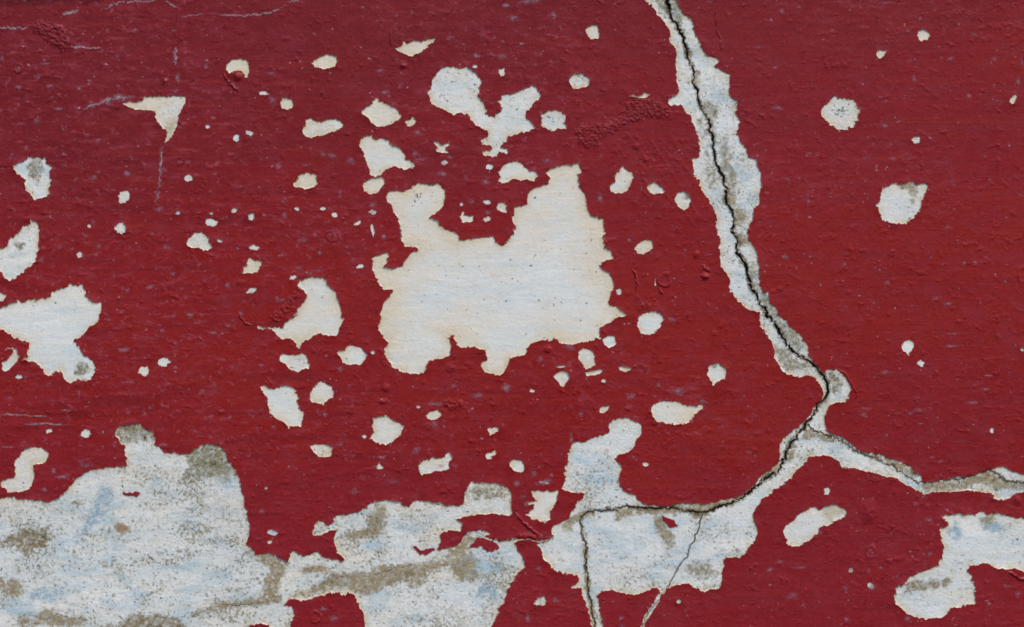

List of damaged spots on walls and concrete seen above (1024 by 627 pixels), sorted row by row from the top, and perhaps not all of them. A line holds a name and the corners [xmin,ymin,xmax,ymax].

peeling [123,95,186,142]
peeling [0,220,40,281]
peeling [13,157,53,201]
peeling [337,64,664,383]
peeling [0,283,102,383]
peeling [257,275,345,372]
peeling [525,0,1024,627]
crack [579,0,1024,627]
peeling [362,414,404,445]
peeling [0,423,525,627]